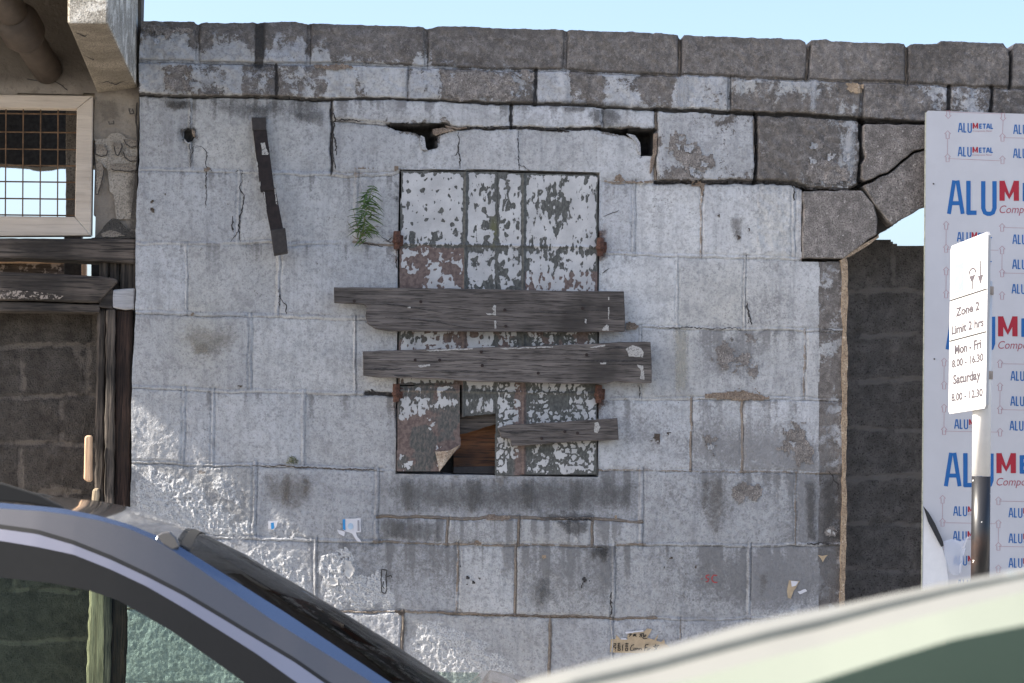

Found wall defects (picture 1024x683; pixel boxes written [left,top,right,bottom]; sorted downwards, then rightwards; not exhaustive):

crack [189,102,245,242]
crack [330,104,360,169]
spalling [389,124,467,151]
peeling [602,129,715,195]